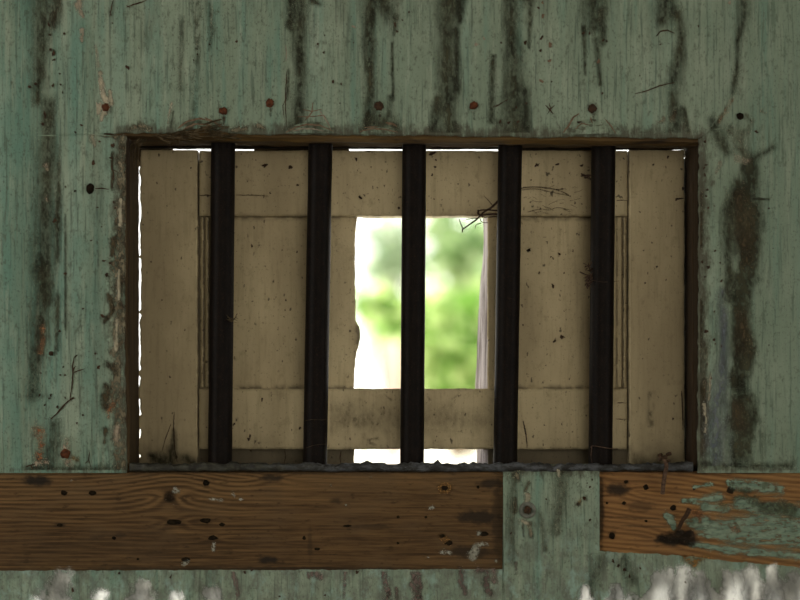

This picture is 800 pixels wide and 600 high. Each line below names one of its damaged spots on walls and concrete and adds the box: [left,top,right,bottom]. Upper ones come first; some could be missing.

peeling [93,65,115,121]
damp [286,0,320,126]
damp [363,0,397,130]
damp [431,0,464,133]
damp [504,0,533,133]
damp [657,0,689,132]
damp [28,0,66,398]
damp [700,146,792,469]
peeling [581,585,591,600]
peeling [606,479,800,600]